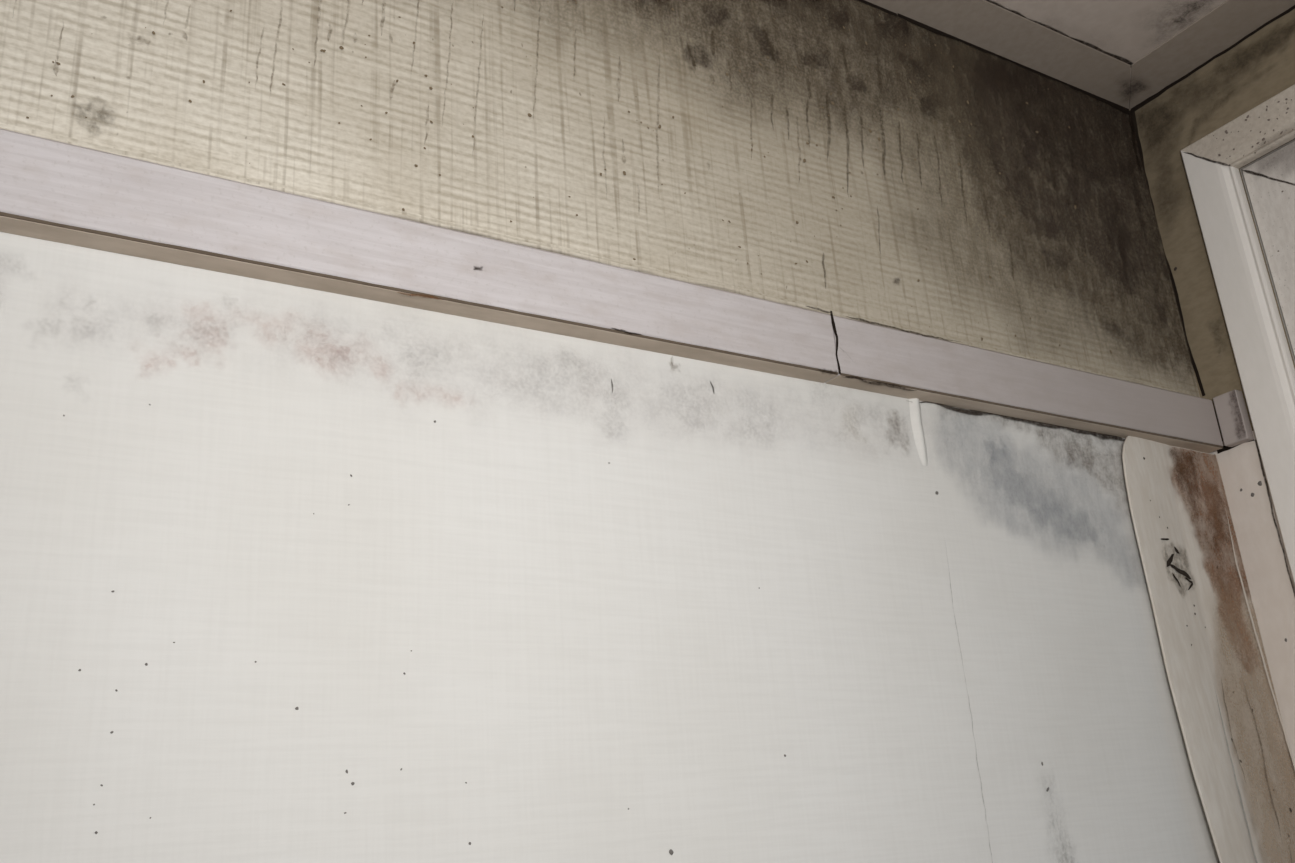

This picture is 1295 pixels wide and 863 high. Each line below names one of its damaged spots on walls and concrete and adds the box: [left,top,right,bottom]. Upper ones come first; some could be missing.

damp [1213,98,1293,166]
damp [624,0,1192,368]
damp [909,401,1125,441]
damp [1159,516,1193,590]
damp [1186,598,1295,863]